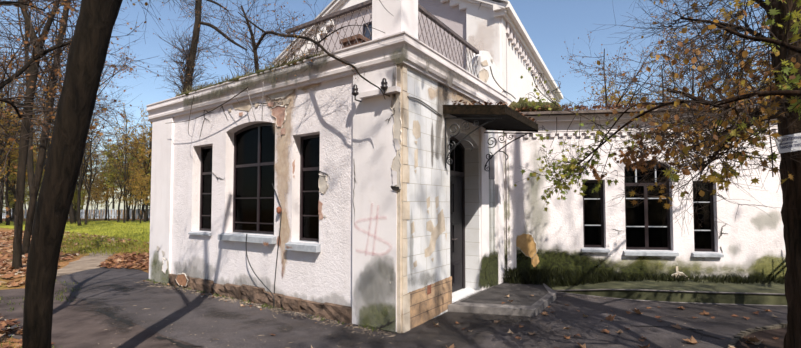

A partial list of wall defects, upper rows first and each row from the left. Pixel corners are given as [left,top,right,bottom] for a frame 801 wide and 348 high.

peeling [412,196,447,270]
peeling [516,233,539,267]